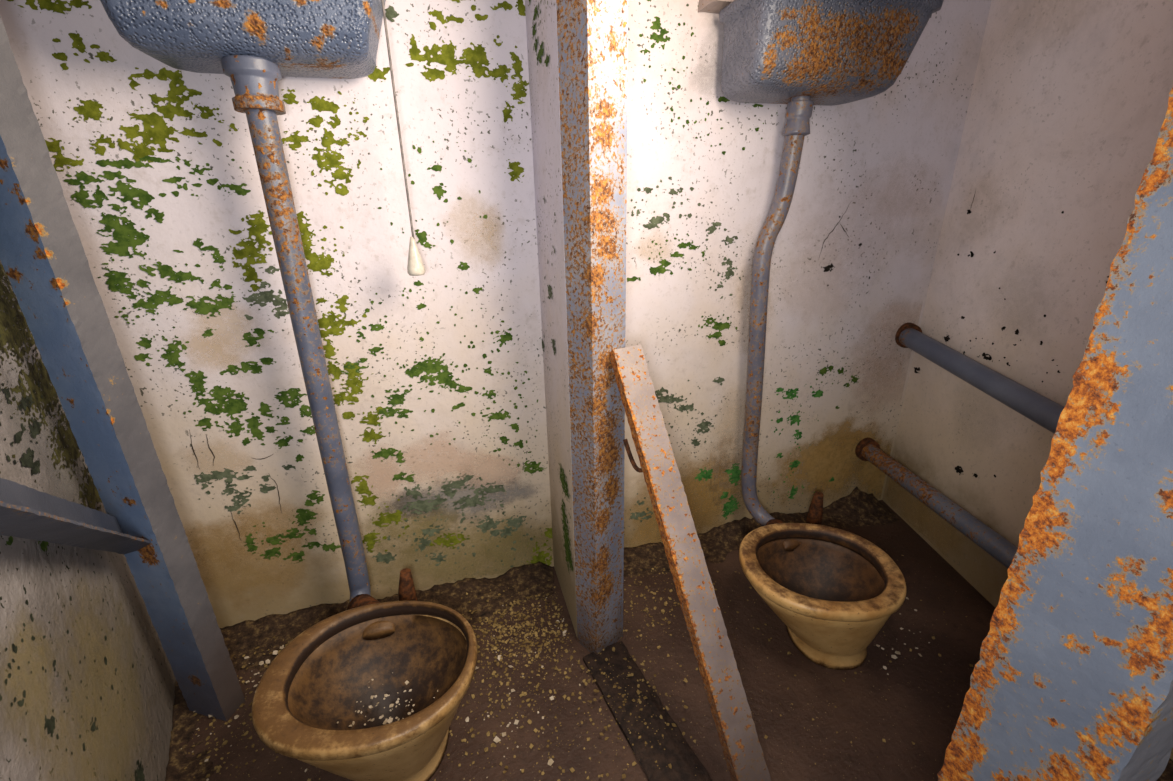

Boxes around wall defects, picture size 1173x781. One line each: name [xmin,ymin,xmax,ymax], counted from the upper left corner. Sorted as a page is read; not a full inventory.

damp [0,263,102,511]
damp [379,443,539,578]